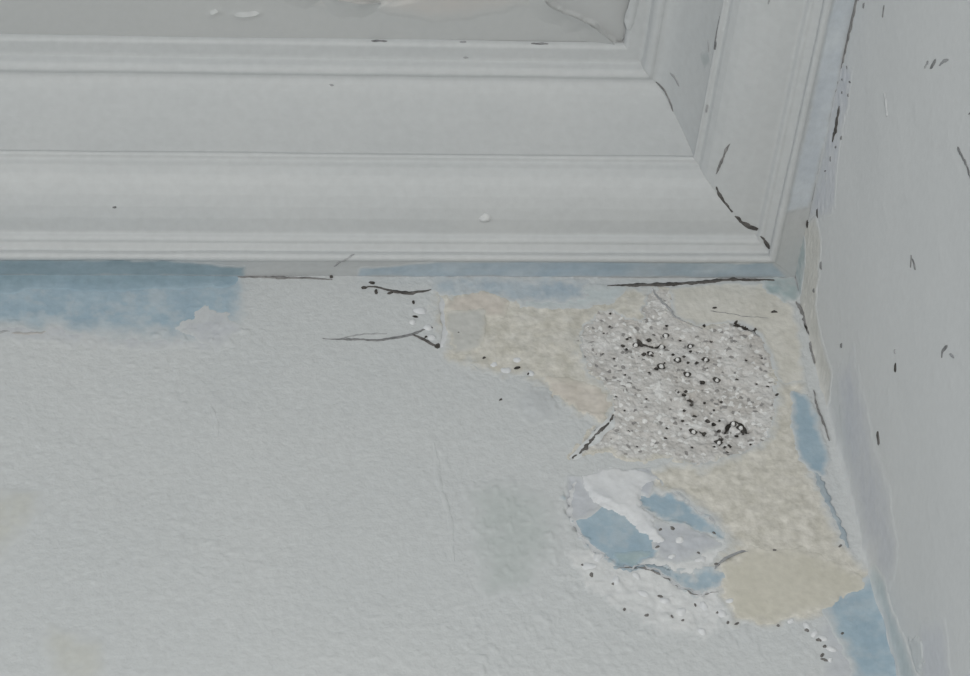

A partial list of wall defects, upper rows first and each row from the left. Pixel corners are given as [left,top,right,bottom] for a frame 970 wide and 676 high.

crack [656,82,673,111]
crack [716,144,770,249]
peeling [0,259,250,354]
crack [361,281,431,295]
crack [607,277,775,329]
crack [322,329,435,346]
flaking render [356,0,919,676]